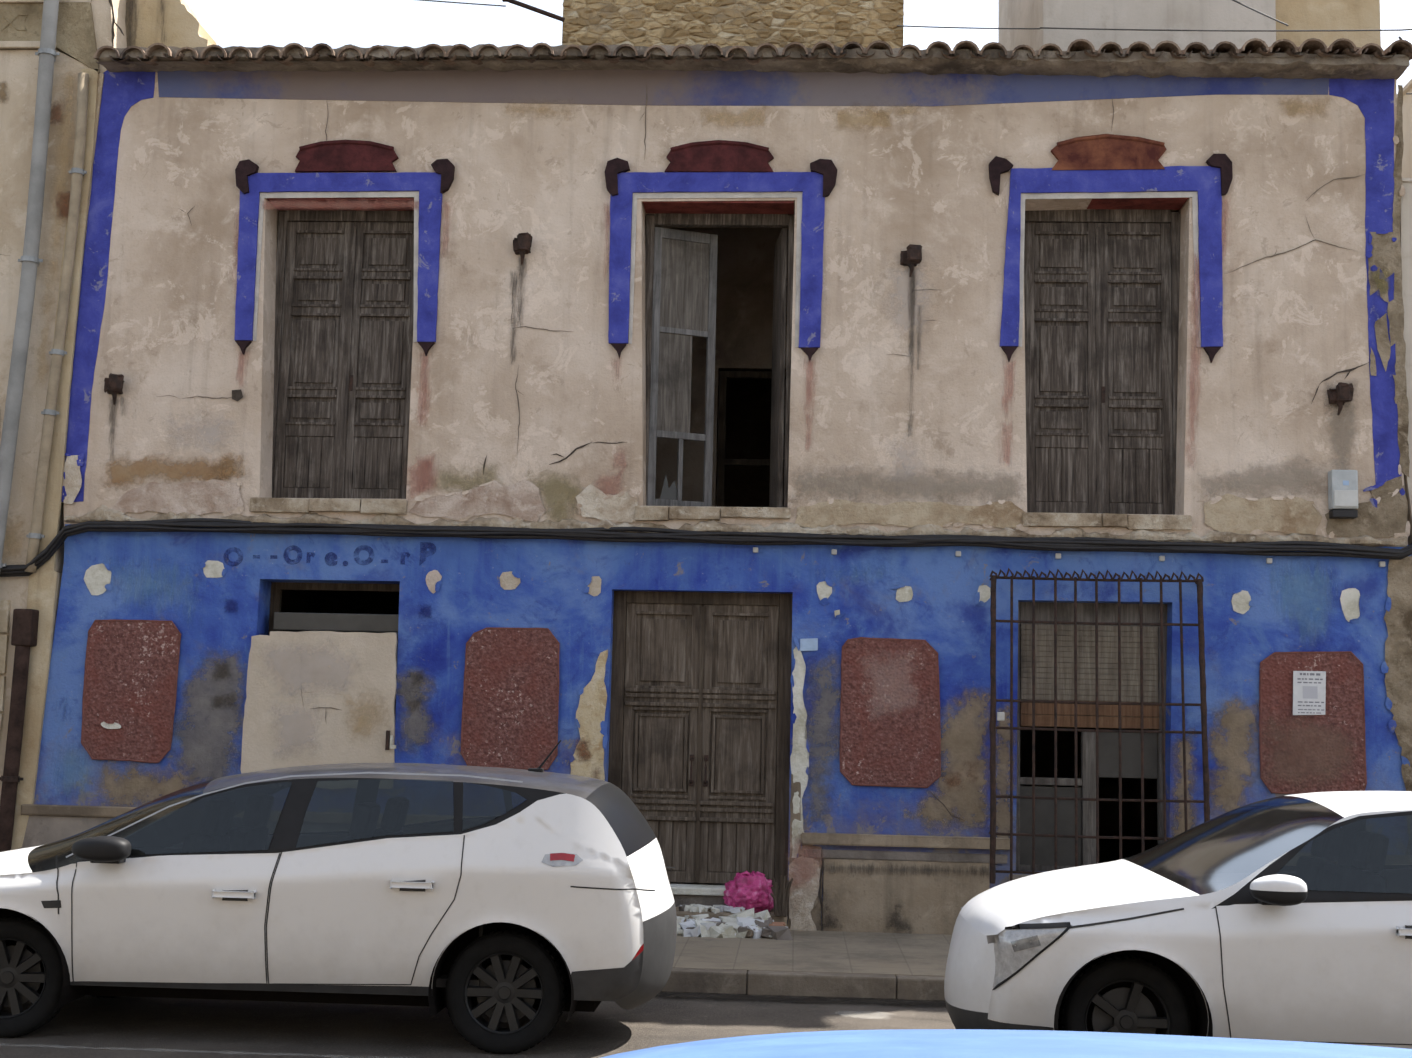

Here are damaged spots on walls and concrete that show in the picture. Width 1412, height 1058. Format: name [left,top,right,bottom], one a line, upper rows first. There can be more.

crack [1227,174,1365,273]
crack [511,287,574,332]
flaking render [1204,85,1410,538]
damp [106,398,237,487]
crack [479,367,523,474]
crack [549,442,623,465]
flaking render [574,484,639,524]
peeling [1231,589,1255,614]
peeling [1340,588,1362,623]
peeling [568,650,608,781]
flaking render [1381,556,1412,791]
peeling [769,636,841,931]